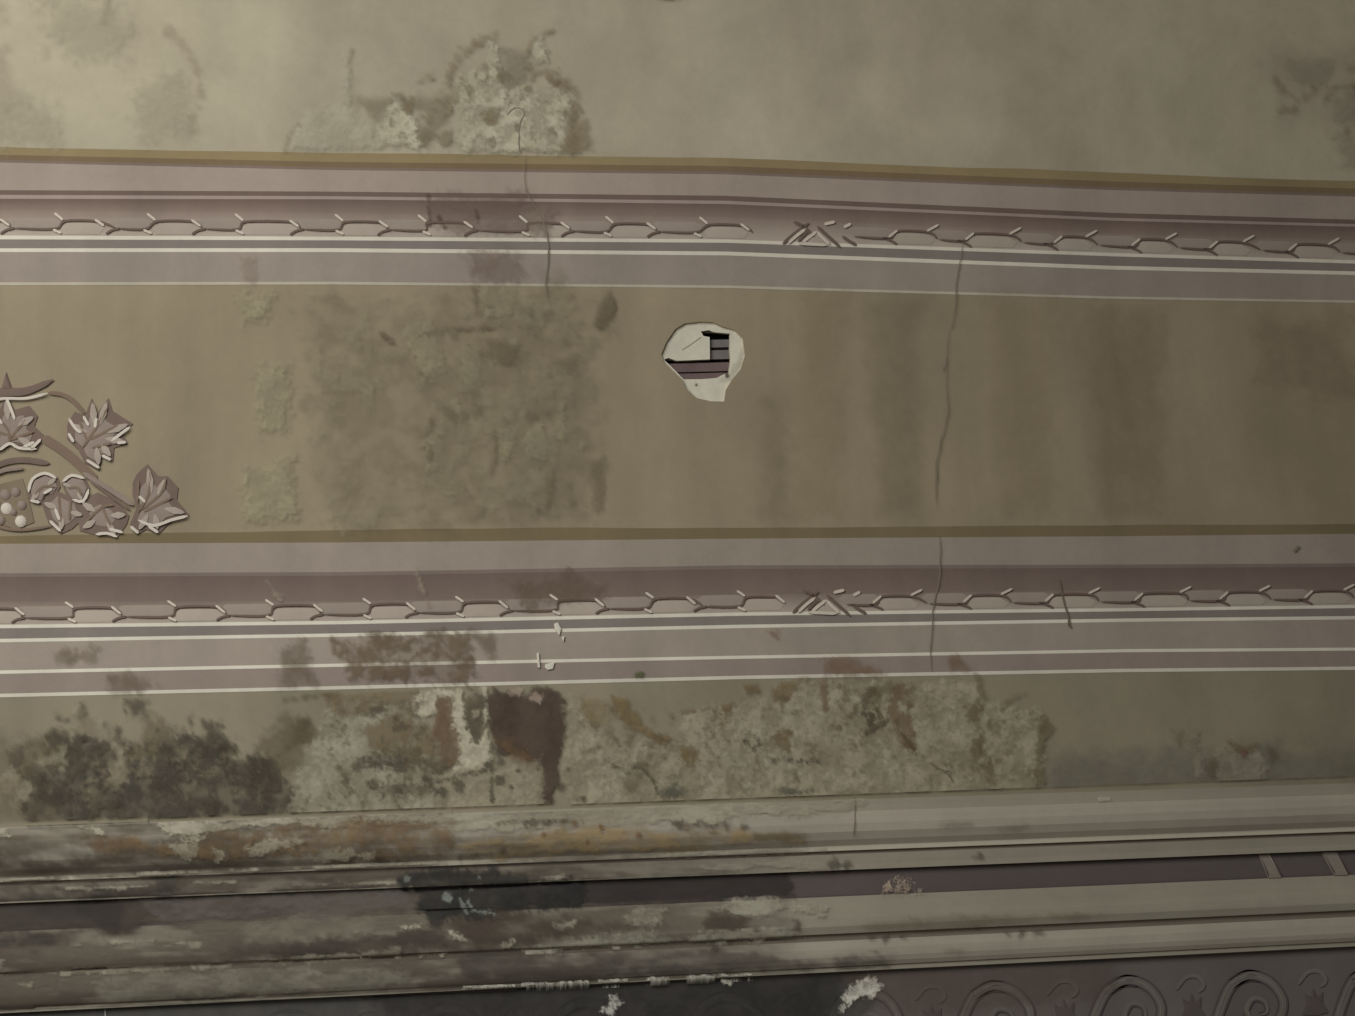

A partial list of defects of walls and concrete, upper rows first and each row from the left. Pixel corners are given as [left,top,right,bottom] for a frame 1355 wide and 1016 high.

flaking render [661,322,745,402]
water stain [0,631,804,944]
peeling [4,878,77,889]
peeling [501,908,667,954]
peeling [691,893,827,951]
peeling [463,979,627,1015]
peeling [687,974,752,985]